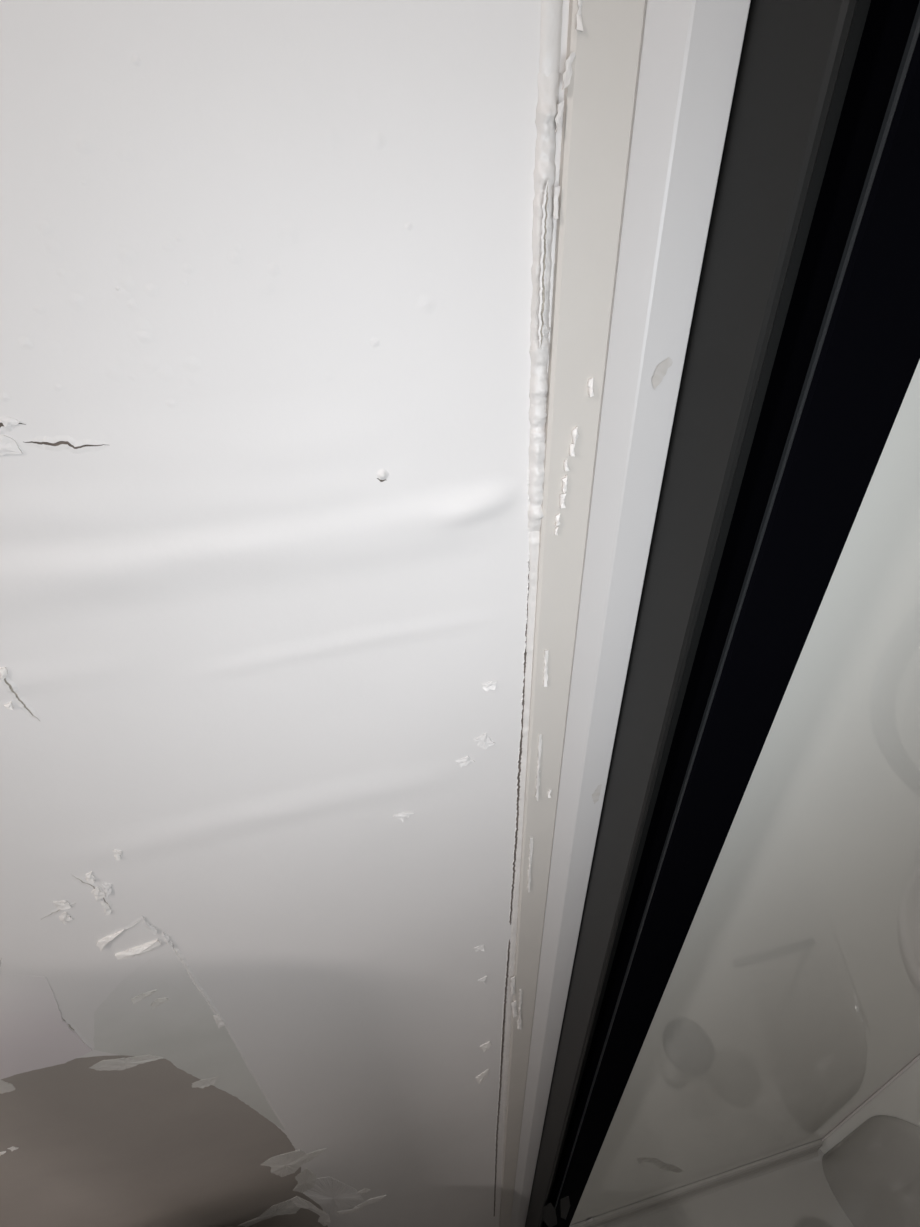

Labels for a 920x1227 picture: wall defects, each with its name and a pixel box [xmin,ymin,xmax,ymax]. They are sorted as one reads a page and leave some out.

crack [0,416,109,456]
crack [0,667,42,721]
peeling [0,916,386,1227]